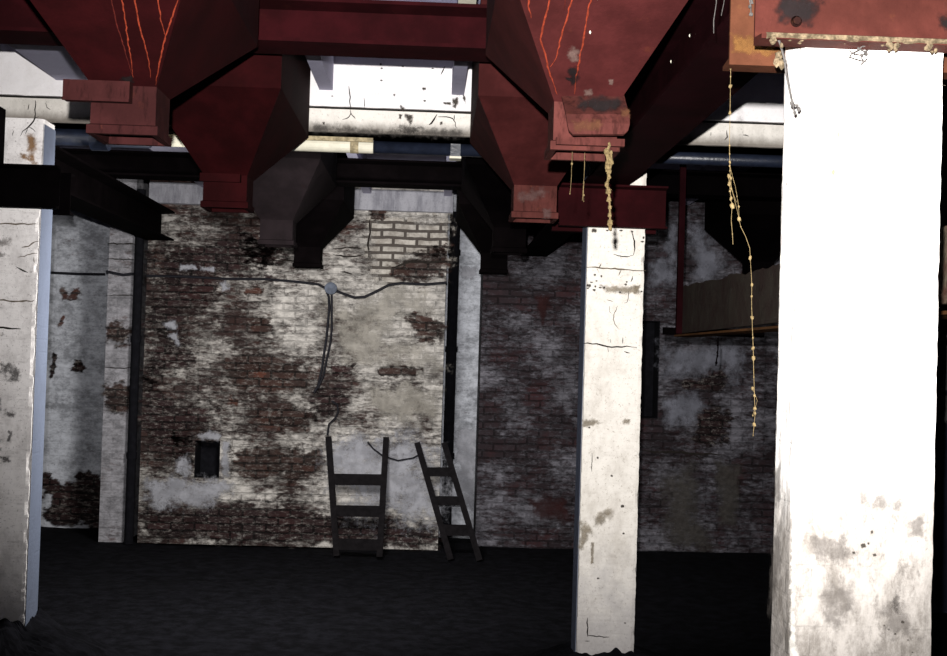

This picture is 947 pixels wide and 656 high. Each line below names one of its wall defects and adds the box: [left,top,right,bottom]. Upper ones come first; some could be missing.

rust [111,0,178,82]
rust [540,0,573,94]
rust [574,0,592,94]
rust [735,38,777,55]
rust [21,135,36,164]
peeling [369,210,388,221]
crack [0,223,38,273]
peeling [389,244,452,293]
peeling [404,311,447,346]
mould [0,363,19,382]
peeling [377,365,423,378]